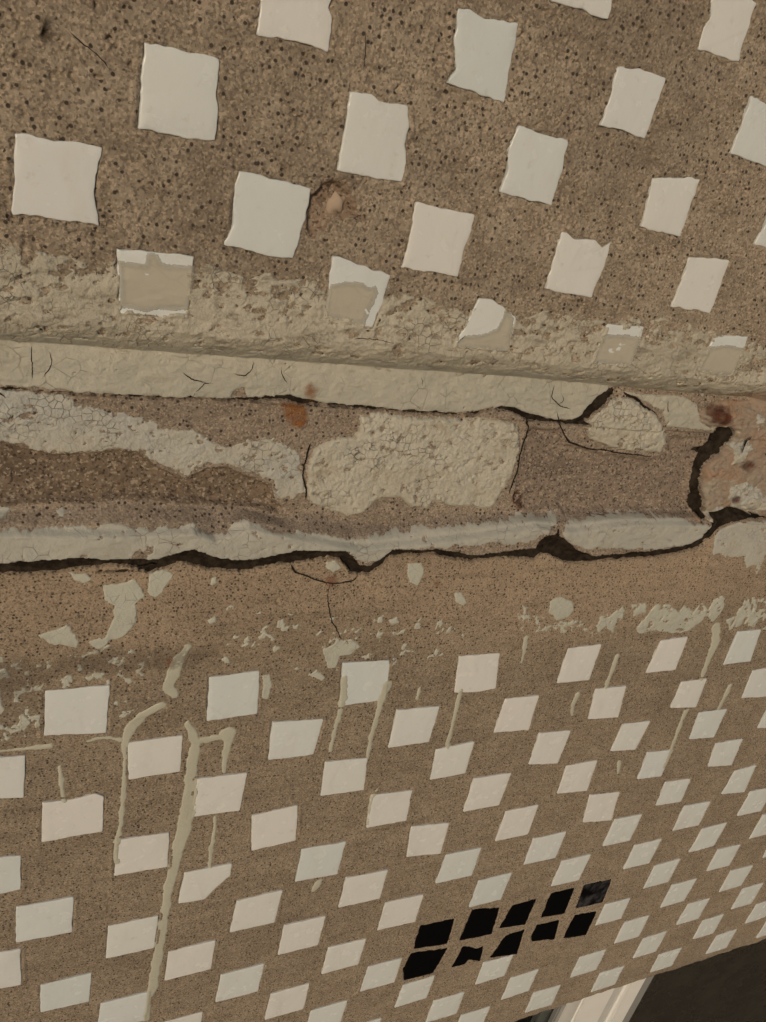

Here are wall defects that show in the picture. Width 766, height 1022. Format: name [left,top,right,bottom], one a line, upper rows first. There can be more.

spalling [304,177,367,239]
crack [114,374,209,398]
peeling [0,243,766,689]
crack [232,363,669,496]
corrosion [707,405,732,426]
crack [0,427,766,639]
peeling [0,657,52,741]
peeling [262,674,272,699]